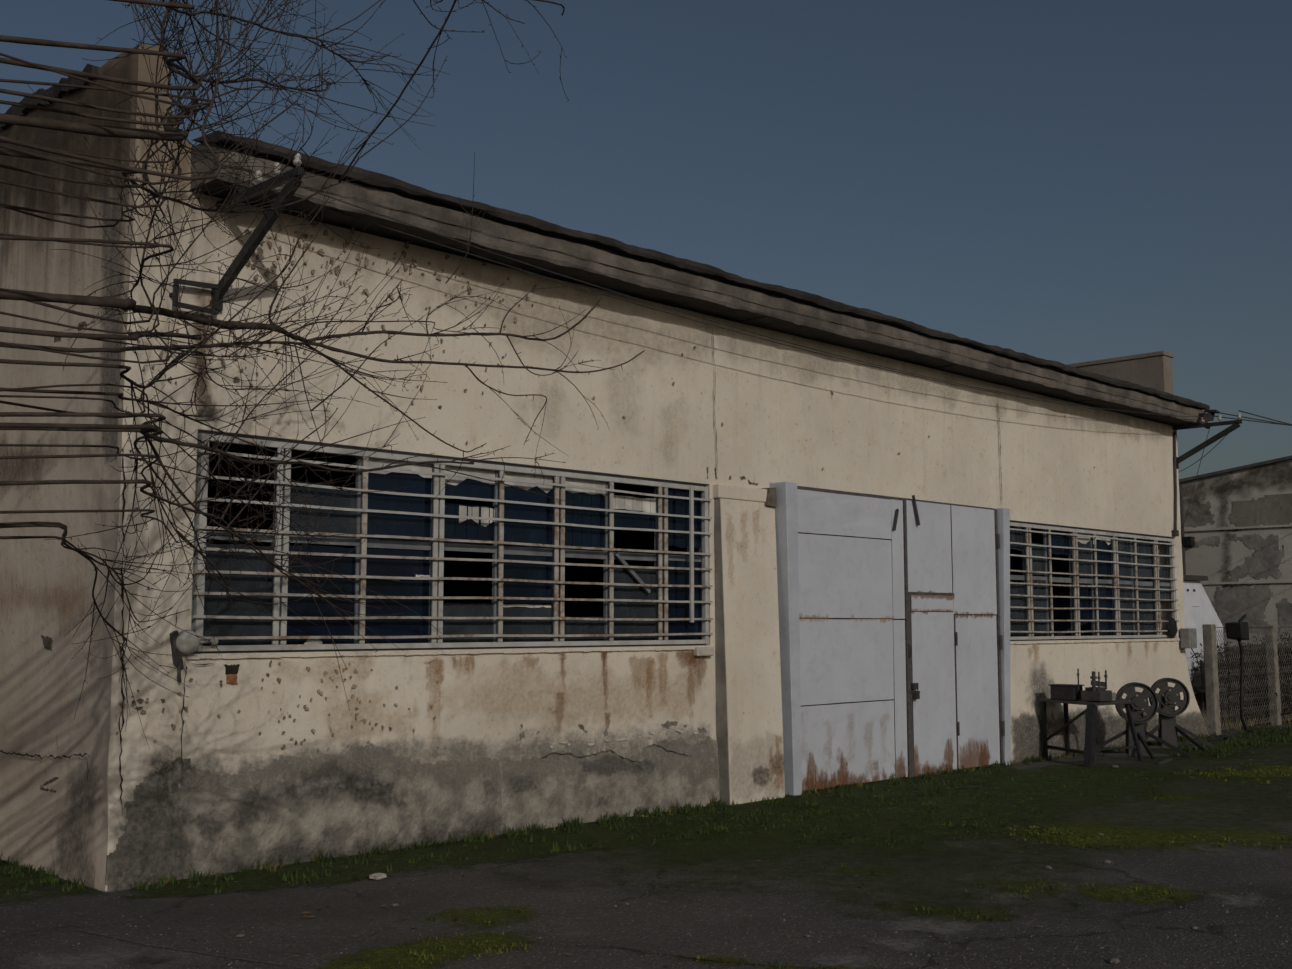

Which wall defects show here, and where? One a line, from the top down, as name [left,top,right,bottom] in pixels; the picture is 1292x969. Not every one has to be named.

peeling [1183,493,1292,636]
corrosion [631,651,706,696]
leakage [113,734,718,891]
corrosion [802,741,990,792]